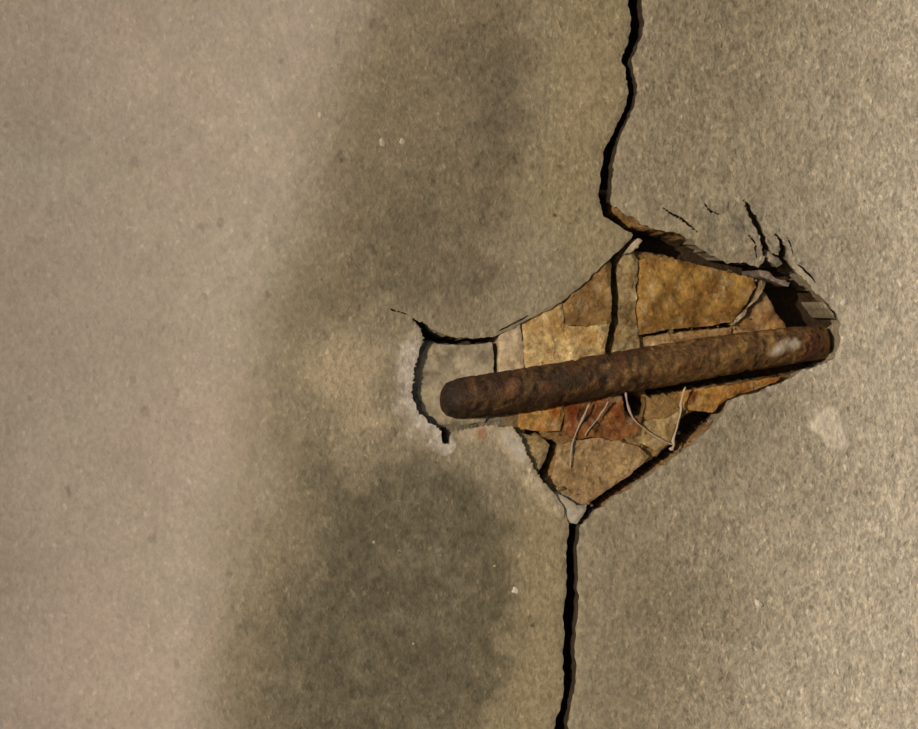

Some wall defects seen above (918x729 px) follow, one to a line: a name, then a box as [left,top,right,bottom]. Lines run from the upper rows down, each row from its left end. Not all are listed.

crack [599,0,644,205]
damp [171,0,564,729]
spalling [411,190,841,535]
peeling [809,406,853,453]
crack [554,523,580,729]